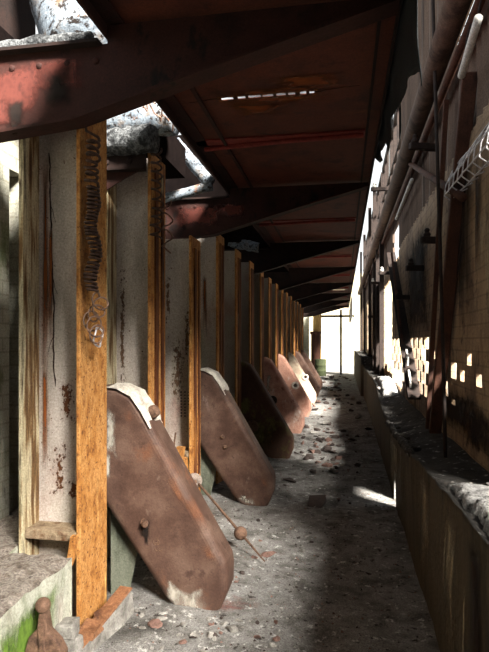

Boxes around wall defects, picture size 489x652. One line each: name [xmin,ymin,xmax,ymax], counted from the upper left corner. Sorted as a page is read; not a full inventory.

crack [48,153,56,233]
rust [43,173,52,346]
crack [48,261,57,386]
rust [60,378,76,423]
rust [52,444,76,498]
water stain [2,638,15,652]